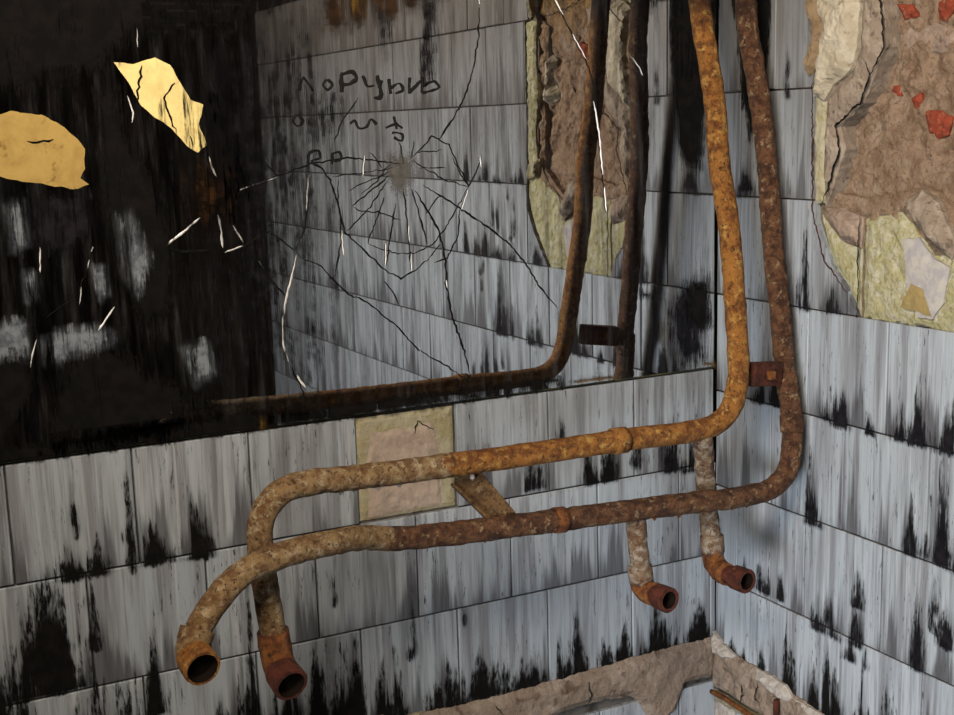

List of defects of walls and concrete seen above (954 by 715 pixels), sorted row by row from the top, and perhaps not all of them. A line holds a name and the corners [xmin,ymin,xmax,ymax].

spalling [803,0,954,332]
leakage [820,392,850,430]
leakage [804,448,822,528]
leakage [890,384,954,573]
spalling [408,630,824,715]
rust [710,689,761,715]
leakage [780,623,796,696]
leakage [908,583,953,673]